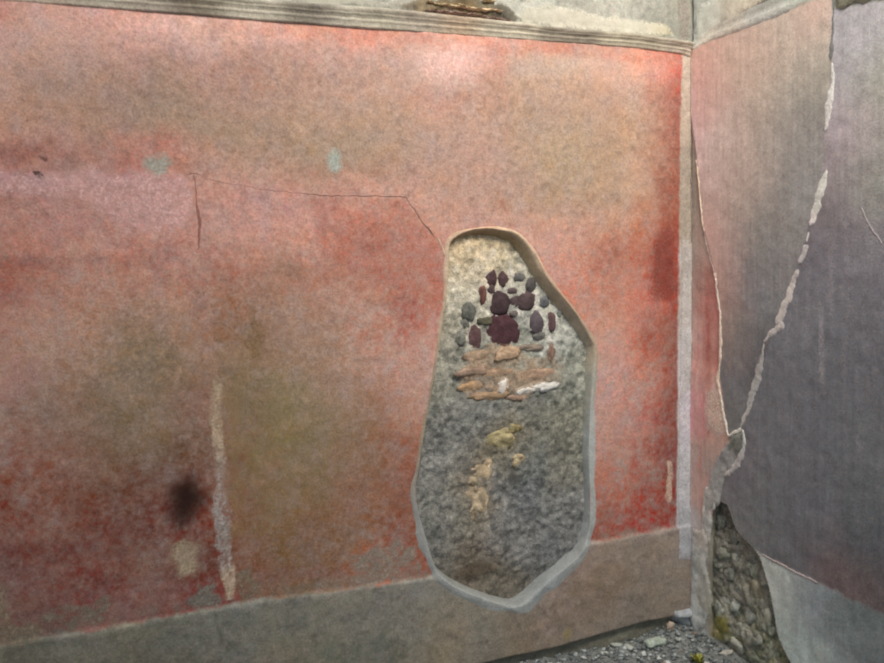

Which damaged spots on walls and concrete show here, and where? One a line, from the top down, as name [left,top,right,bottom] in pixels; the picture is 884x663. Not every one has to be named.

crack [824,0,835,131]
crack [187,173,445,255]
crack [690,121,828,435]
damp [174,481,201,521]
peeling [200,380,235,599]
flaking render [410,226,598,614]